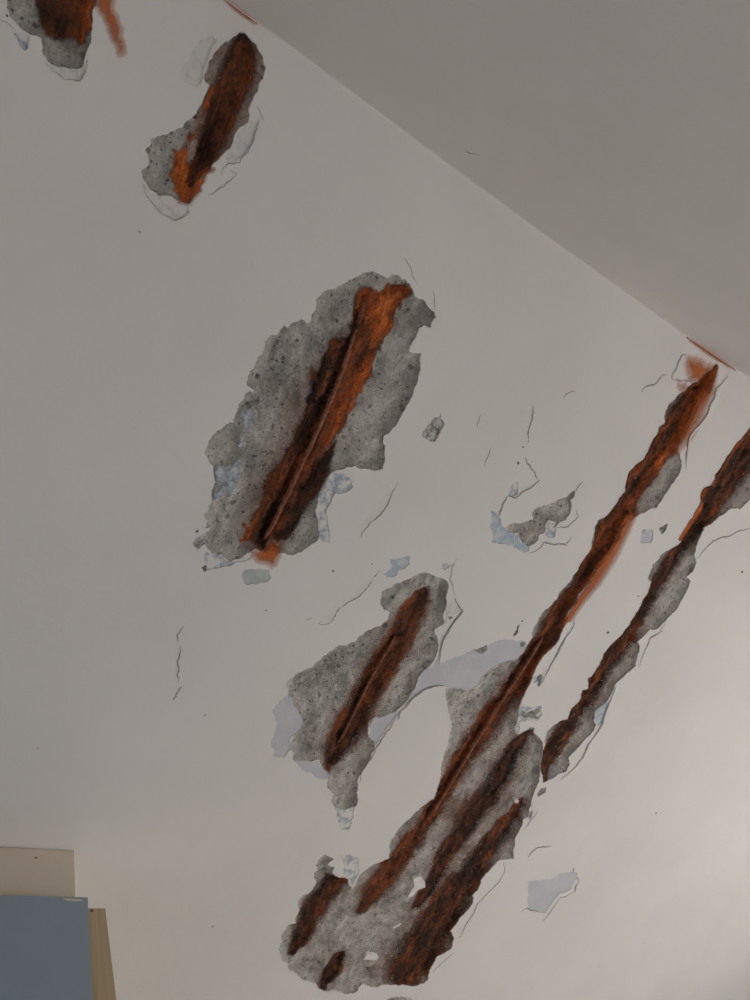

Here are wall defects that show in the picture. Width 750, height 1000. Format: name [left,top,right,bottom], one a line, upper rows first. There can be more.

spalling [7,0,97,82]
rust [98,0,123,51]
spalling [141,33,265,220]
rust [255,542,280,564]
spalling [192,271,436,585]
crack [497,409,540,518]
crack [531,483,582,553]
spalling [271,365,750,1000]